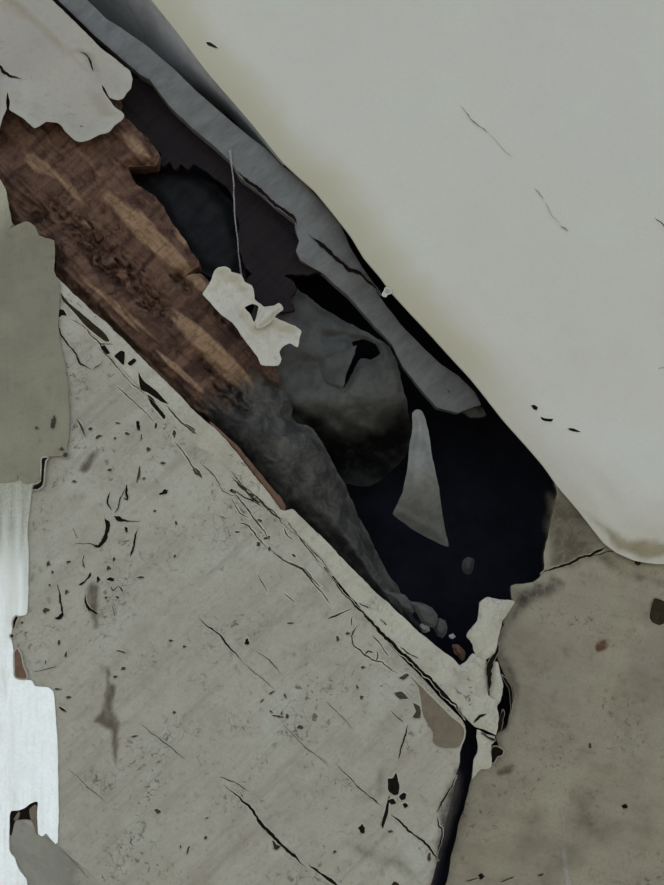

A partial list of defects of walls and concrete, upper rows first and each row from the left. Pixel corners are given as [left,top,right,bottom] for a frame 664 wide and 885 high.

peeling [0,0,139,142]
crack [459,105,514,158]
crack [534,188,569,232]
crack [654,217,664,229]
peeling [0,180,203,491]
peeling [198,266,301,366]
spalling [229,215,555,779]
peeling [95,556,117,584]
peeling [9,615,28,680]
damp [96,686,118,753]
peeling [9,802,75,885]
crack [218,775,340,885]